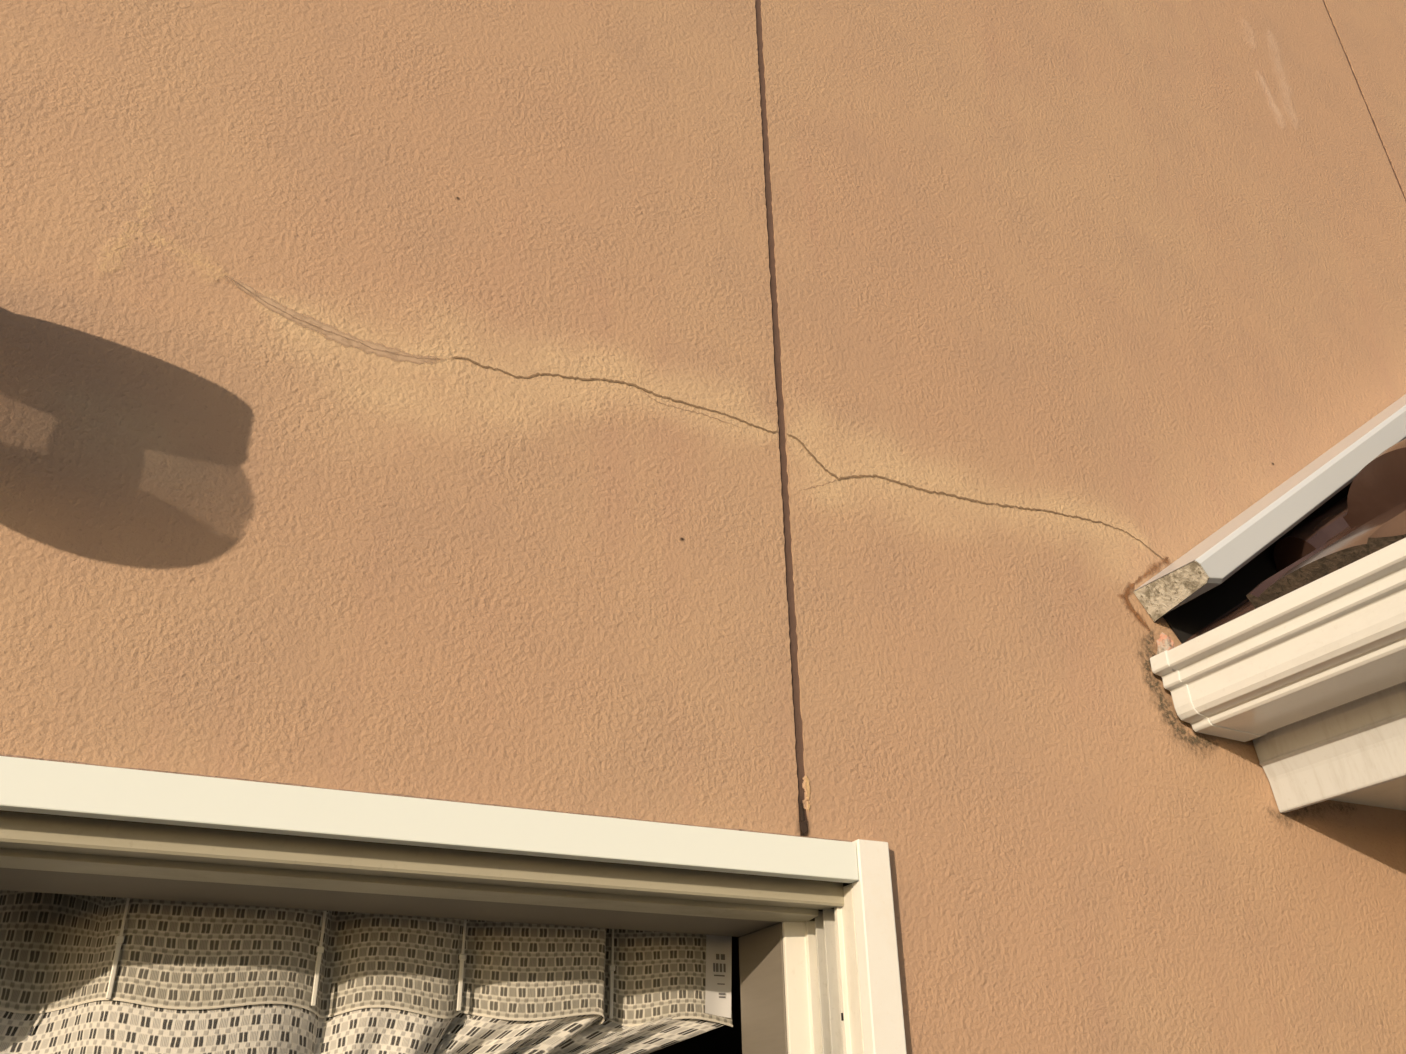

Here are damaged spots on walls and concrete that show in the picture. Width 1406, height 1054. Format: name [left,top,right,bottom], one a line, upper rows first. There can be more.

crack [233,282,1164,559]